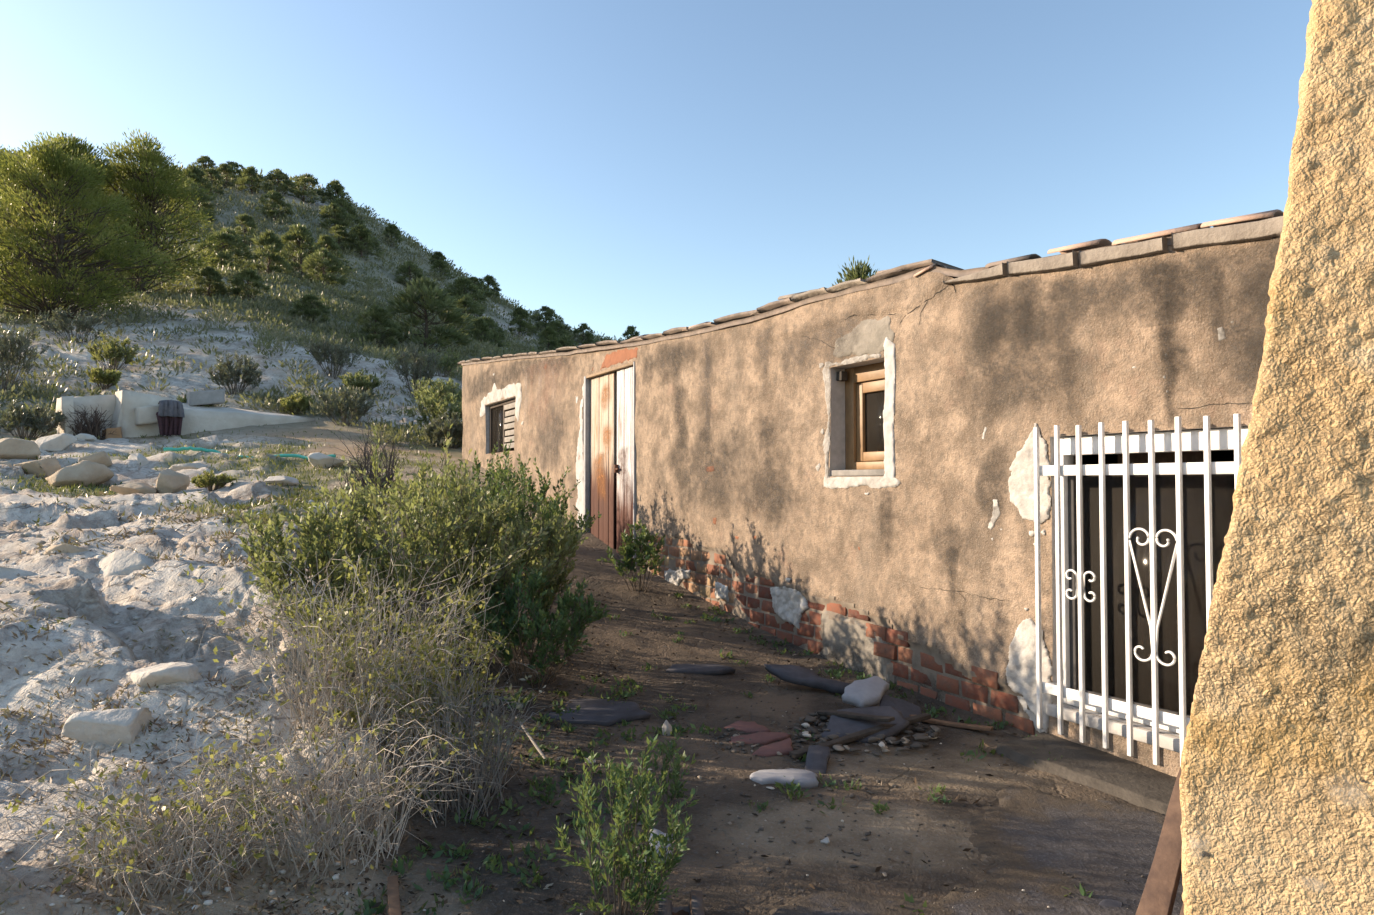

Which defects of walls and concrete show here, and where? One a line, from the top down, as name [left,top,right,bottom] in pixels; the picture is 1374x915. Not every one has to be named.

damp [976,243,1279,405]
corrosion [595,430,628,494]
damp [645,347,737,502]
peeling [988,423,1052,546]
flaking render [636,529,1054,735]